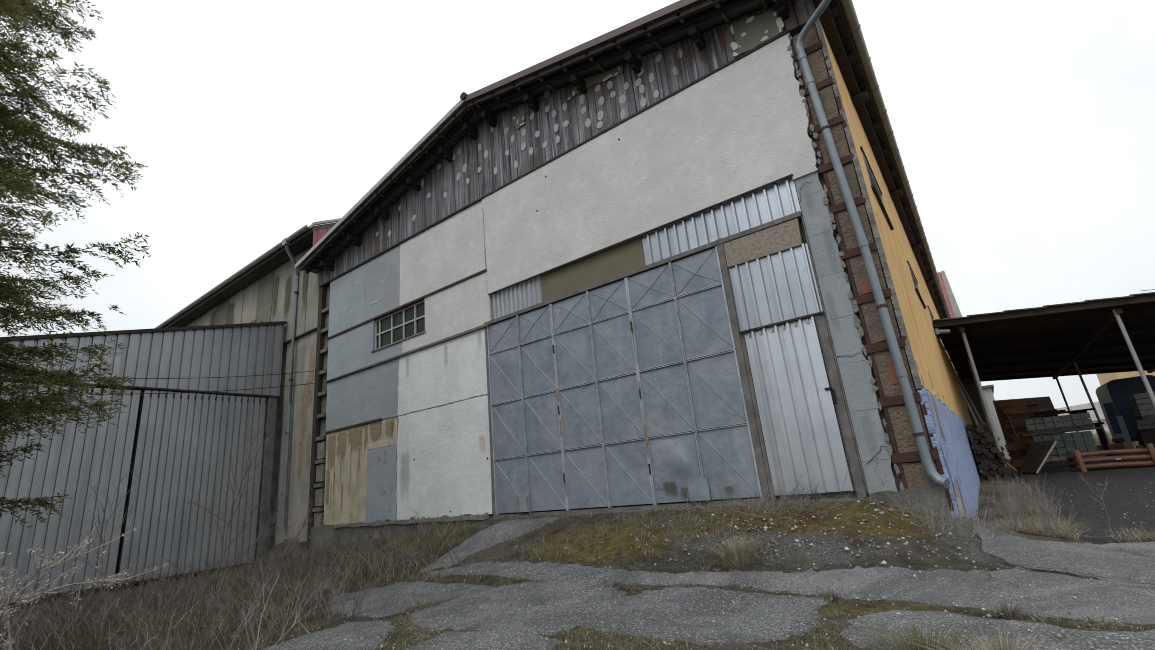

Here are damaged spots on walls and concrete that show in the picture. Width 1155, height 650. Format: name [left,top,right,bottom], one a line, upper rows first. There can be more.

peeling [730,11,821,165]
damp [326,419,394,506]
spalling [916,362,967,518]